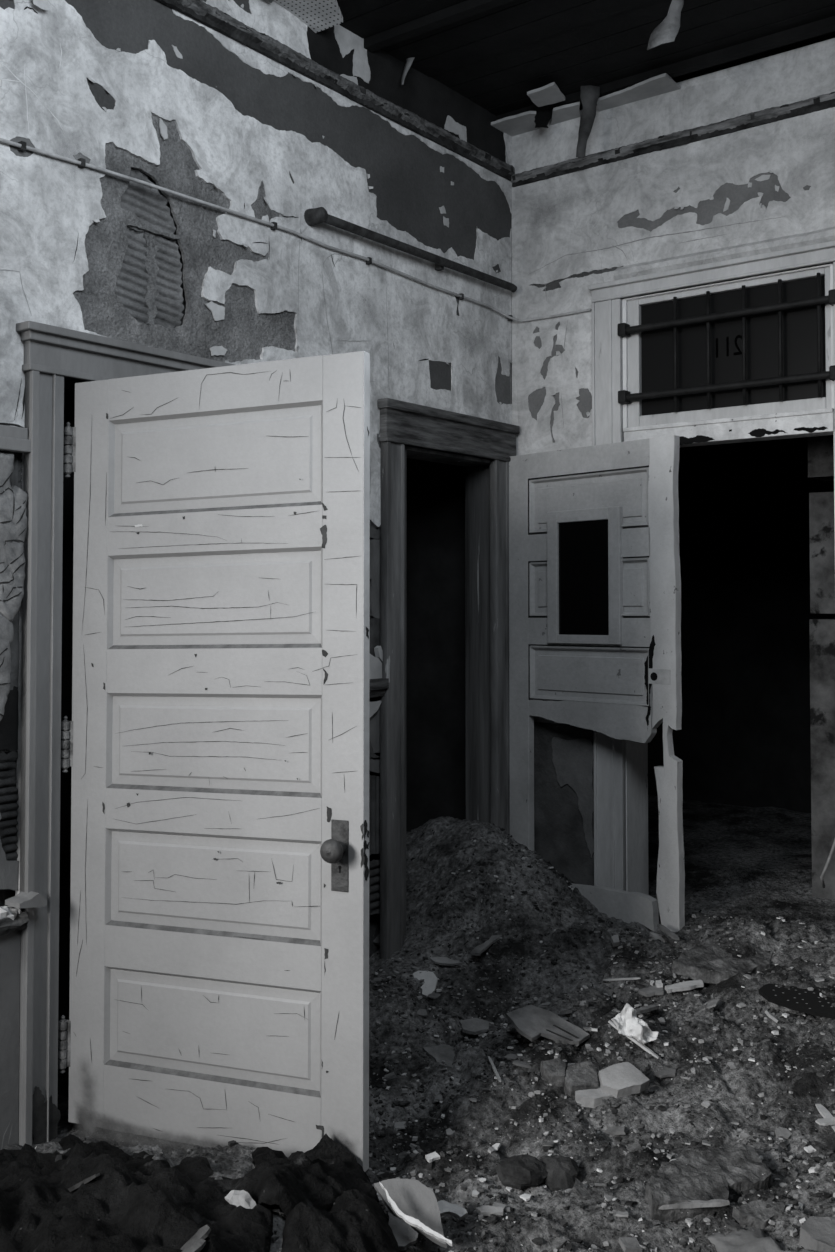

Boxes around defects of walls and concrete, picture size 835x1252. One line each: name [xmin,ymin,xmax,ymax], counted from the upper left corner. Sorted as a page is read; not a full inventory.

peeling [0,0,15,10]
peeling [9,136,35,157]
spalling [73,115,299,363]
peeling [65,0,511,260]
peeling [618,170,791,232]
peeling [429,360,451,391]
peeling [495,356,513,405]
peeling [528,322,565,443]
peeling [575,367,592,418]
spalling [370,524,383,679]
spalling [0,611,19,891]
spalling [360,700,381,916]